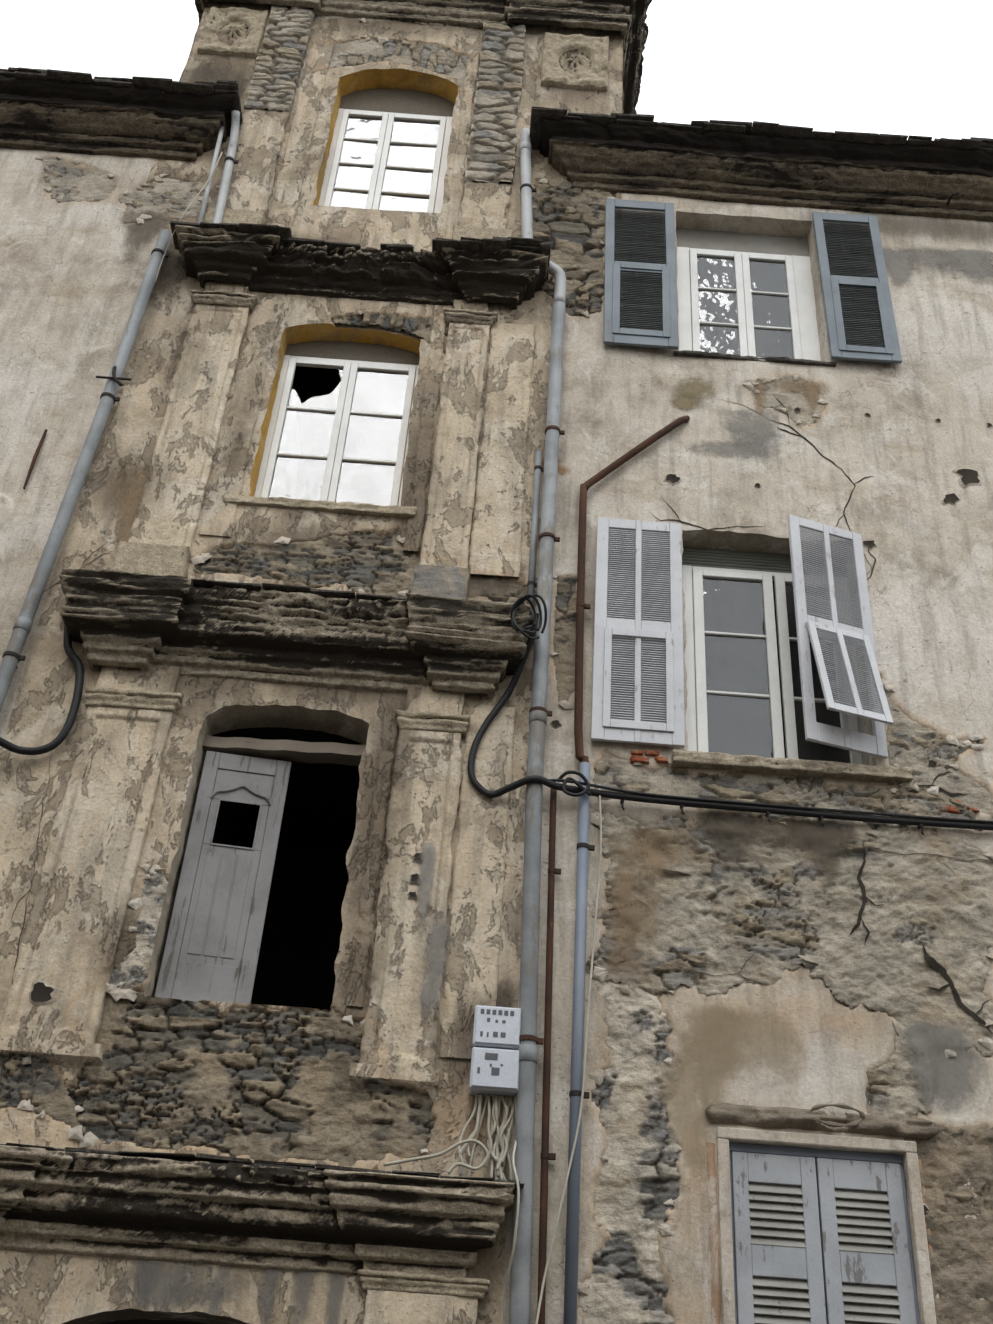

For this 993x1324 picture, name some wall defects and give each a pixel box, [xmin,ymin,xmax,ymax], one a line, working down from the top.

crack [720,396,876,580]
flaking render [190,530,420,597]
flaking render [467,574,536,607]
crack [845,841,993,943]
flaking render [0,863,437,1166]
flaking render [577,674,993,1324]
crack [923,945,993,1034]